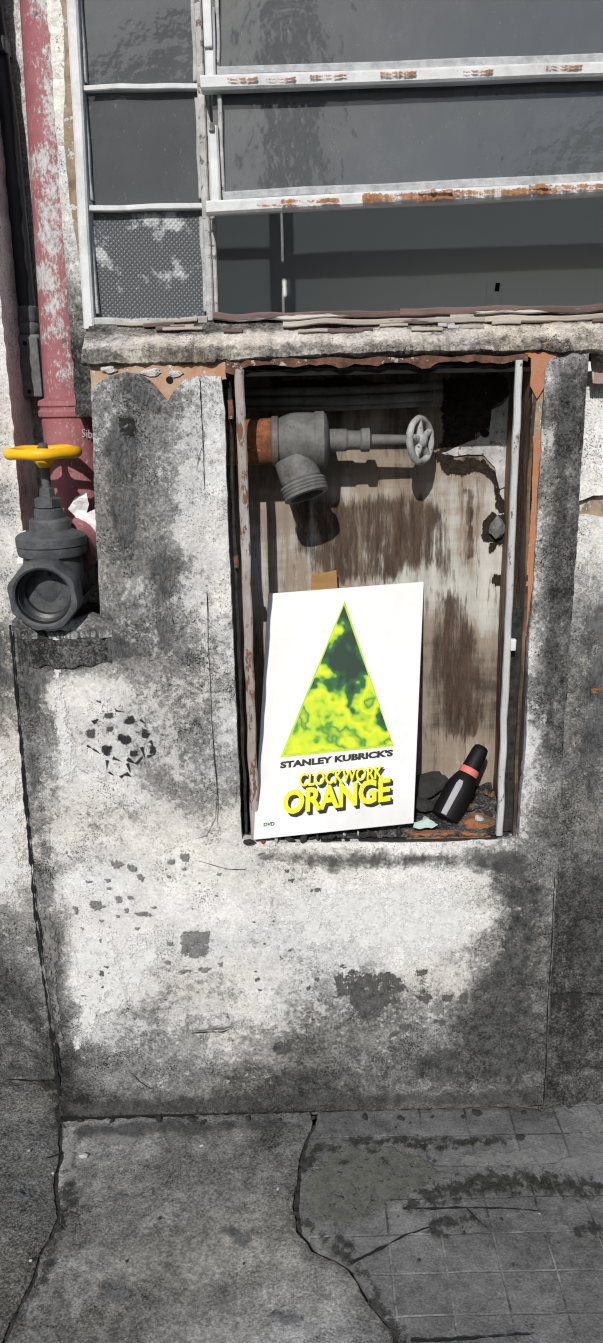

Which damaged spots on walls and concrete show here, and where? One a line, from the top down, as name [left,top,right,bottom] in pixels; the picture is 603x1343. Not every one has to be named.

flaking render [60,0,80,262]
rust [257,198,339,207]
rust [362,183,603,203]
water stain [104,421,137,546]
flaking render [579,495,603,516]
water stain [150,548,179,648]
crack [3,597,555,1343]
water stain [568,852,603,993]
water stain [0,848,549,1342]
water stain [288,1121,603,1343]